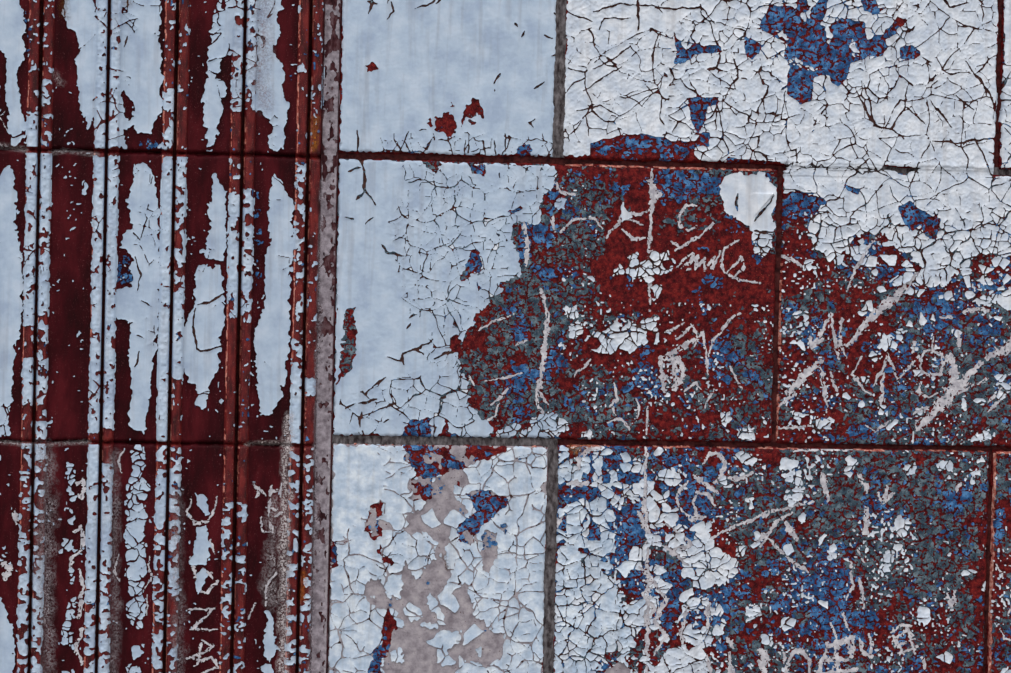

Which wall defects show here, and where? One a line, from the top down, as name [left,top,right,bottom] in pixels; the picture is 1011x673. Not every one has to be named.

peeling [0,0,63,673]
peeling [58,0,676,673]
crack [331,0,1011,673]
peeling [553,0,1011,673]